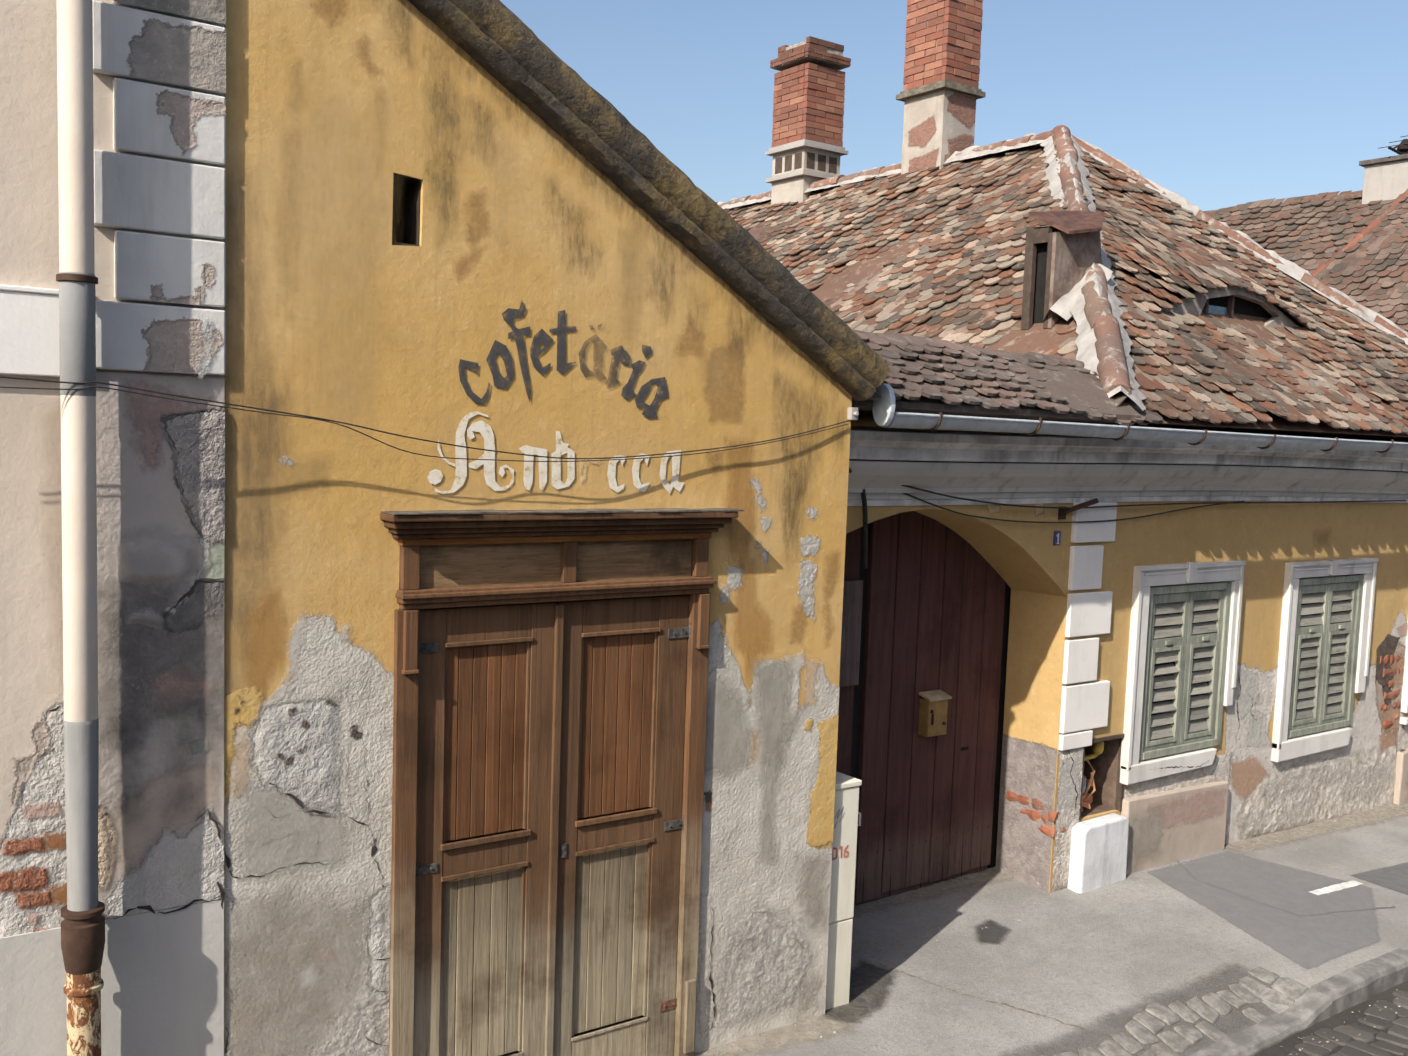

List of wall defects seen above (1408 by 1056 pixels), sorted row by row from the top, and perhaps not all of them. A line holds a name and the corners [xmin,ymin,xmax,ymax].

peeling [126,18,226,154]
peeling [141,263,224,378]
spalling [160,407,225,633]
peeling [720,566,742,604]
peeling [750,479,772,564]
peeling [797,535,820,620]
peeling [0,701,67,938]
peeling [98,614,394,1056]
crack [113,743,384,1056]
peeling [695,621,839,1053]
spalling [1123,611,1408,844]